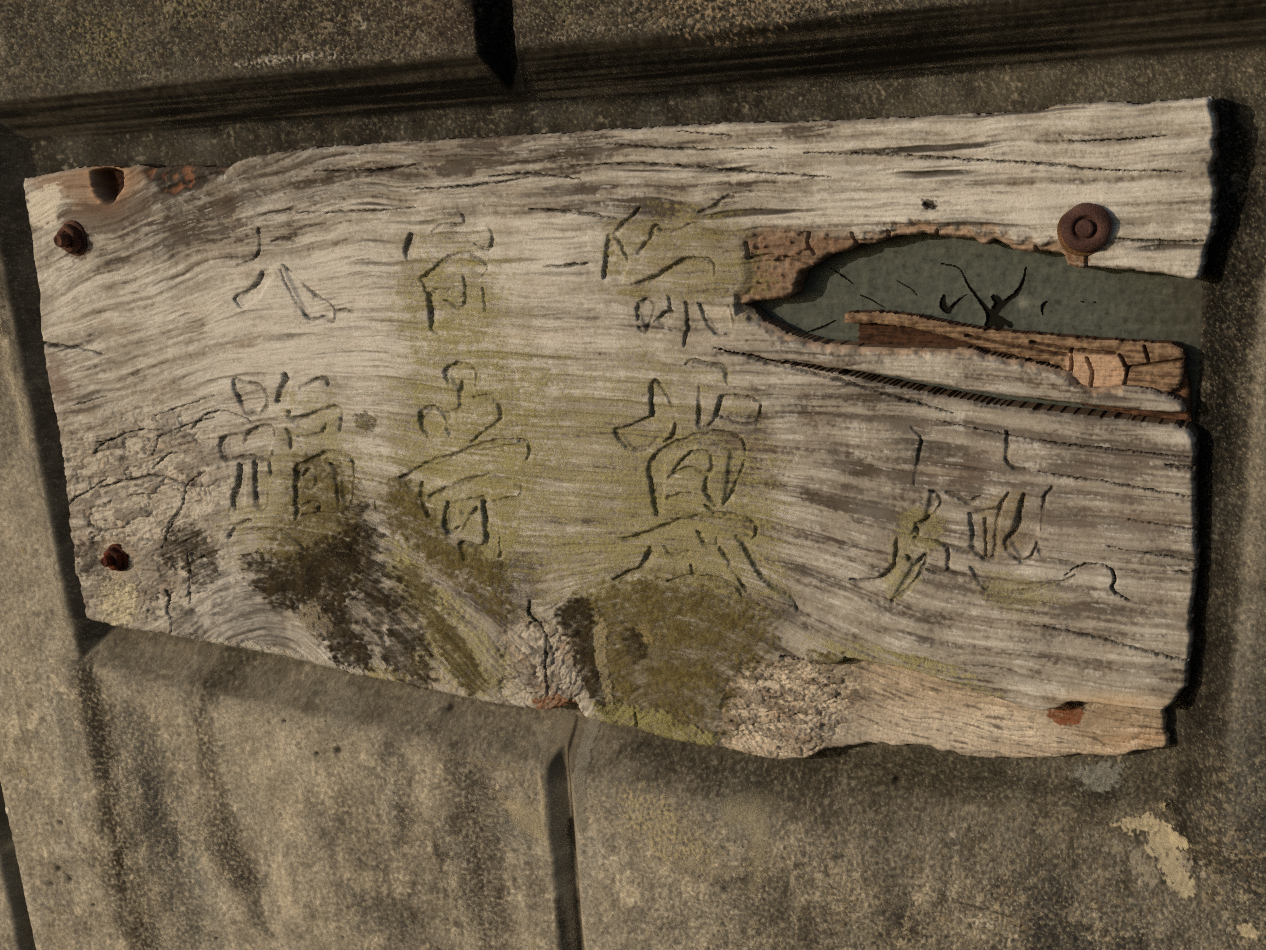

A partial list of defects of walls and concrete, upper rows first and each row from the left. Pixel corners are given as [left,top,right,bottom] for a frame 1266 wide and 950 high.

damp [200,733,255,885]
damp [453,762,499,948]
peeling [1110,801,1196,899]